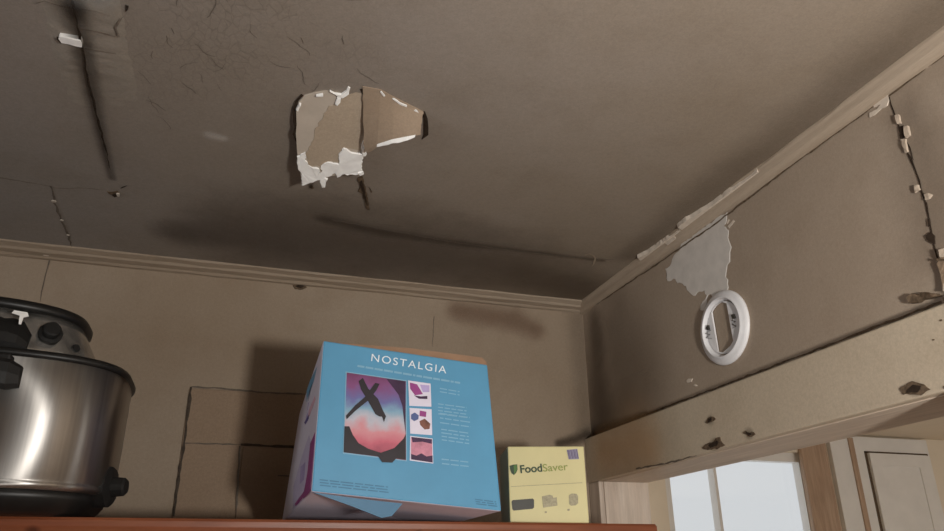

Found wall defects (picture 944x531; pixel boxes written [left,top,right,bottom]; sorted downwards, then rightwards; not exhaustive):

peeling [57,33,82,47]
crack [36,0,129,168]
peeling [316,86,350,106]
crack [0,177,101,245]
peeling [598,55,944,311]
crack [889,97,938,258]
peeling [899,381,931,395]
peeling [702,437,725,450]